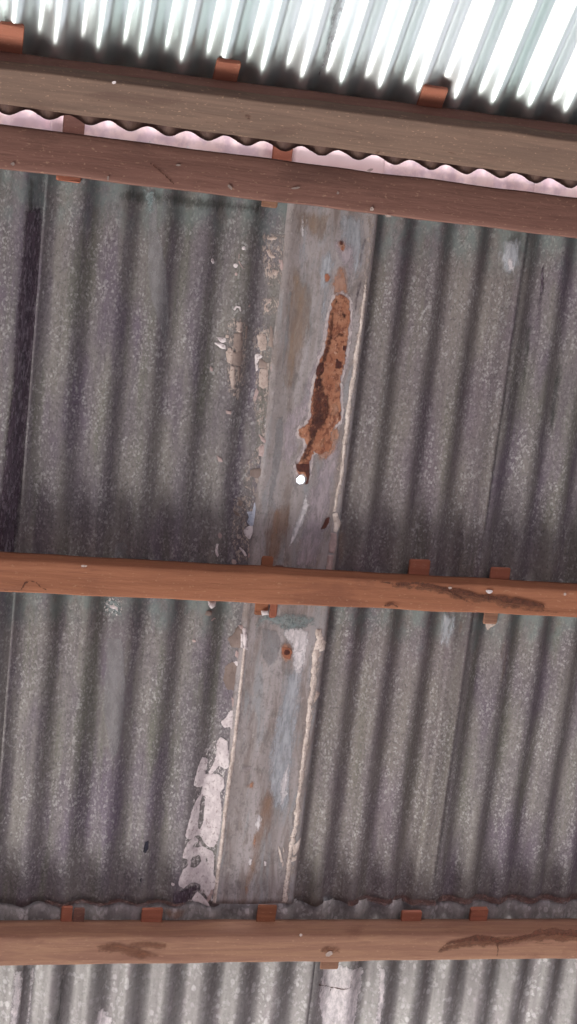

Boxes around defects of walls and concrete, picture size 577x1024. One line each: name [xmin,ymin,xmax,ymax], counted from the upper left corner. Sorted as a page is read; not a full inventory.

peeling [215,233,285,565]
rust [293,267,353,484]
peeling [171,625,248,906]